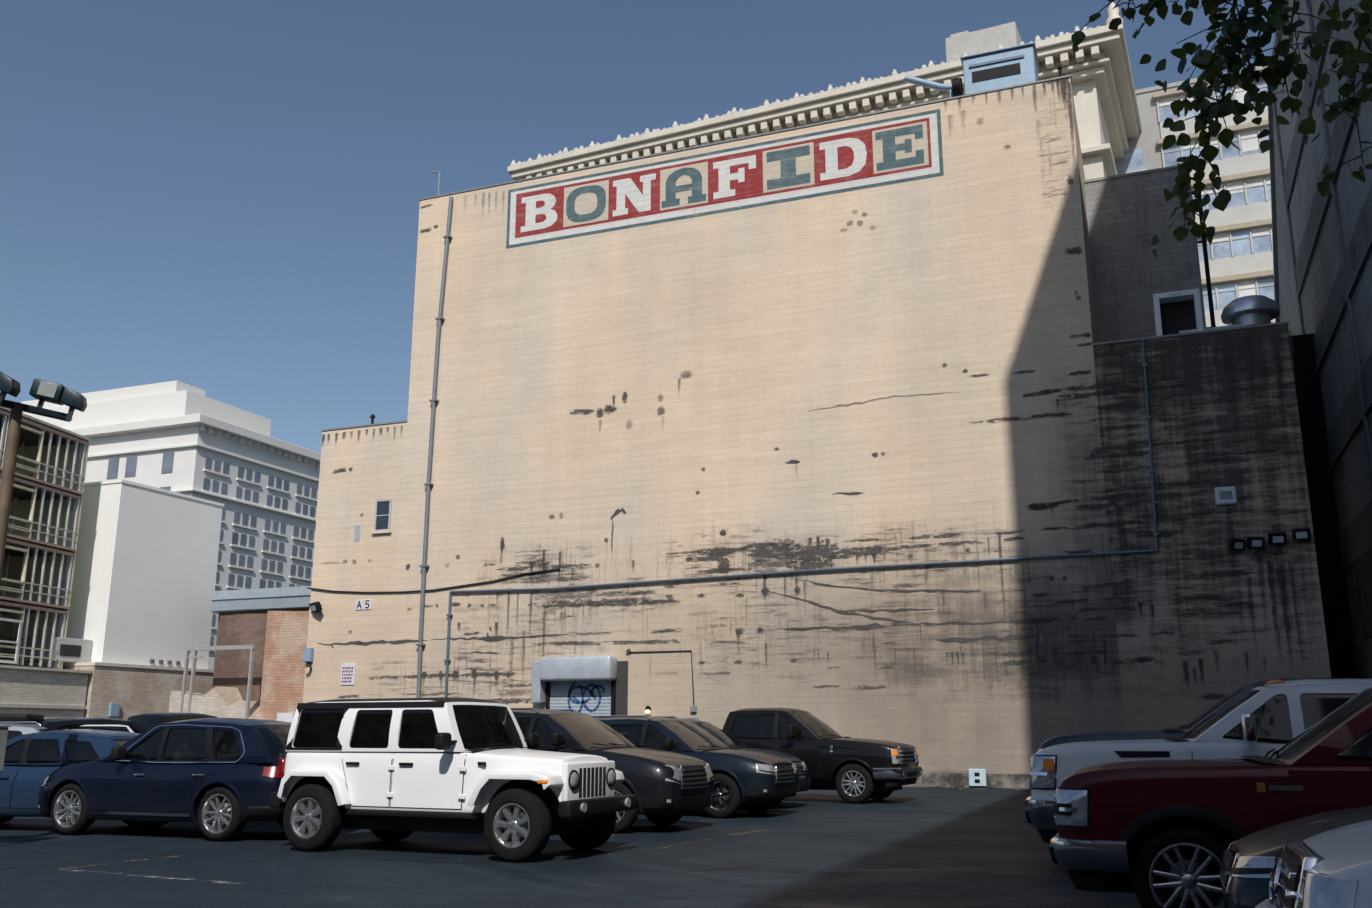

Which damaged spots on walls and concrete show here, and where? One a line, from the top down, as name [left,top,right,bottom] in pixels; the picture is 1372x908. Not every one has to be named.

damp [1251,546,1298,646]
damp [1183,659,1225,699]